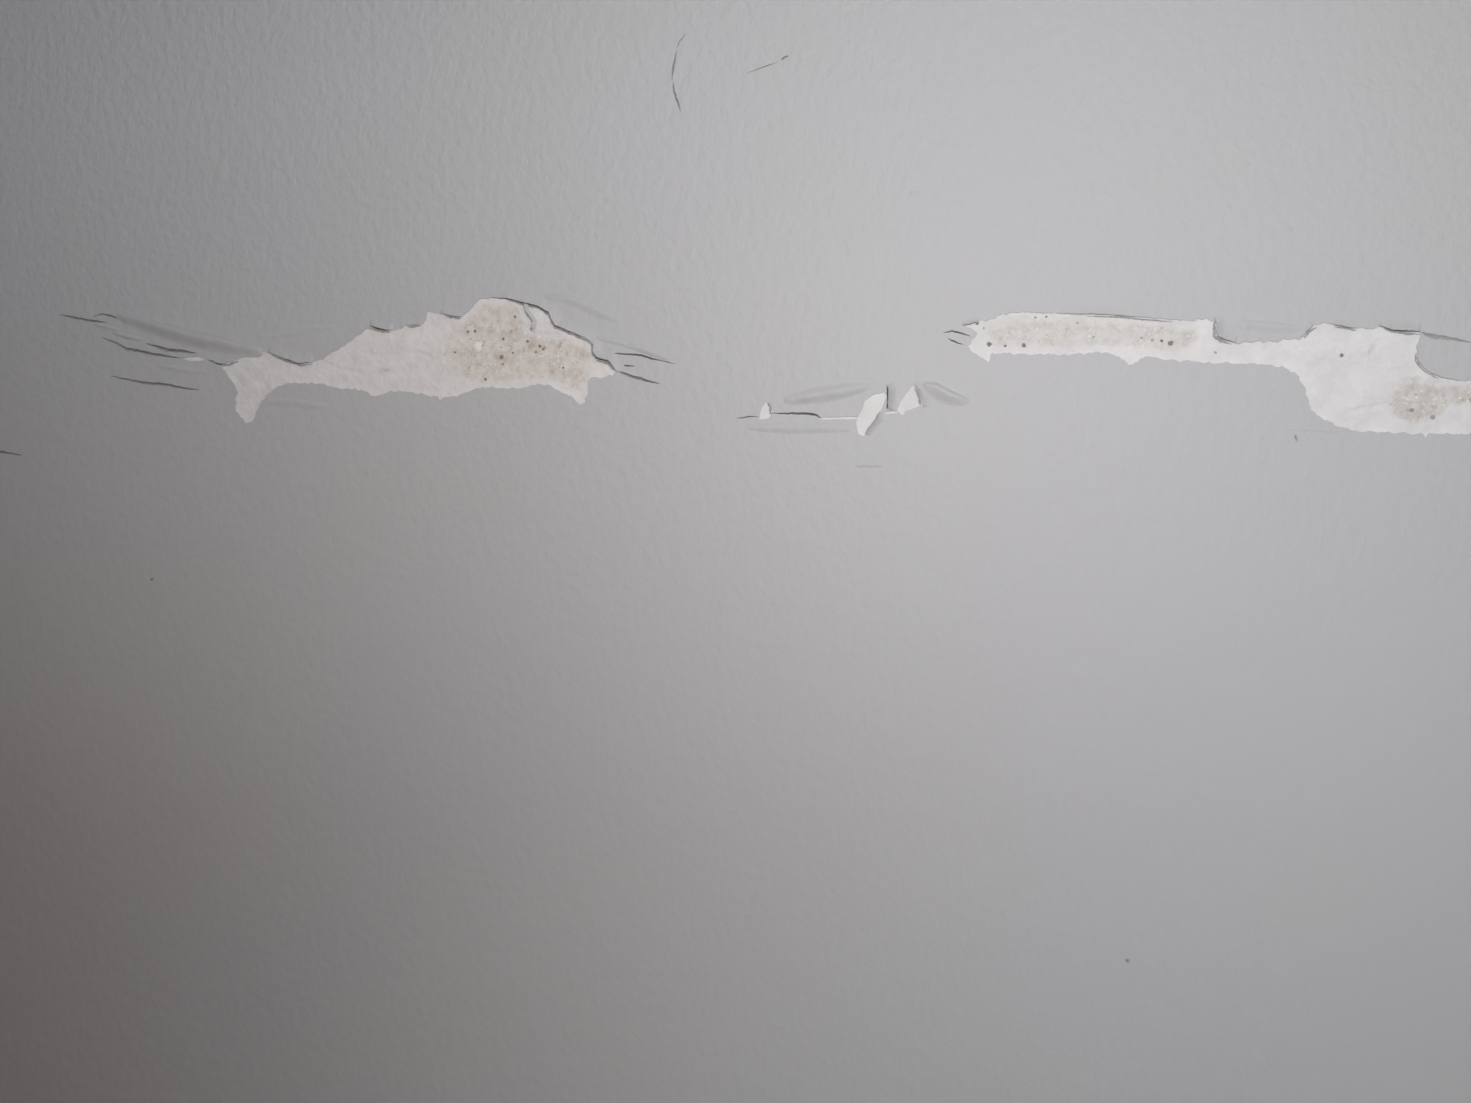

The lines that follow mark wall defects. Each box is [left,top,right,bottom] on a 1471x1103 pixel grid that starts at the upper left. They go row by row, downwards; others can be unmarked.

crack [59,313,225,390]
peeling [183,288,625,423]
peeling [736,380,932,437]
peeling [962,305,1471,438]